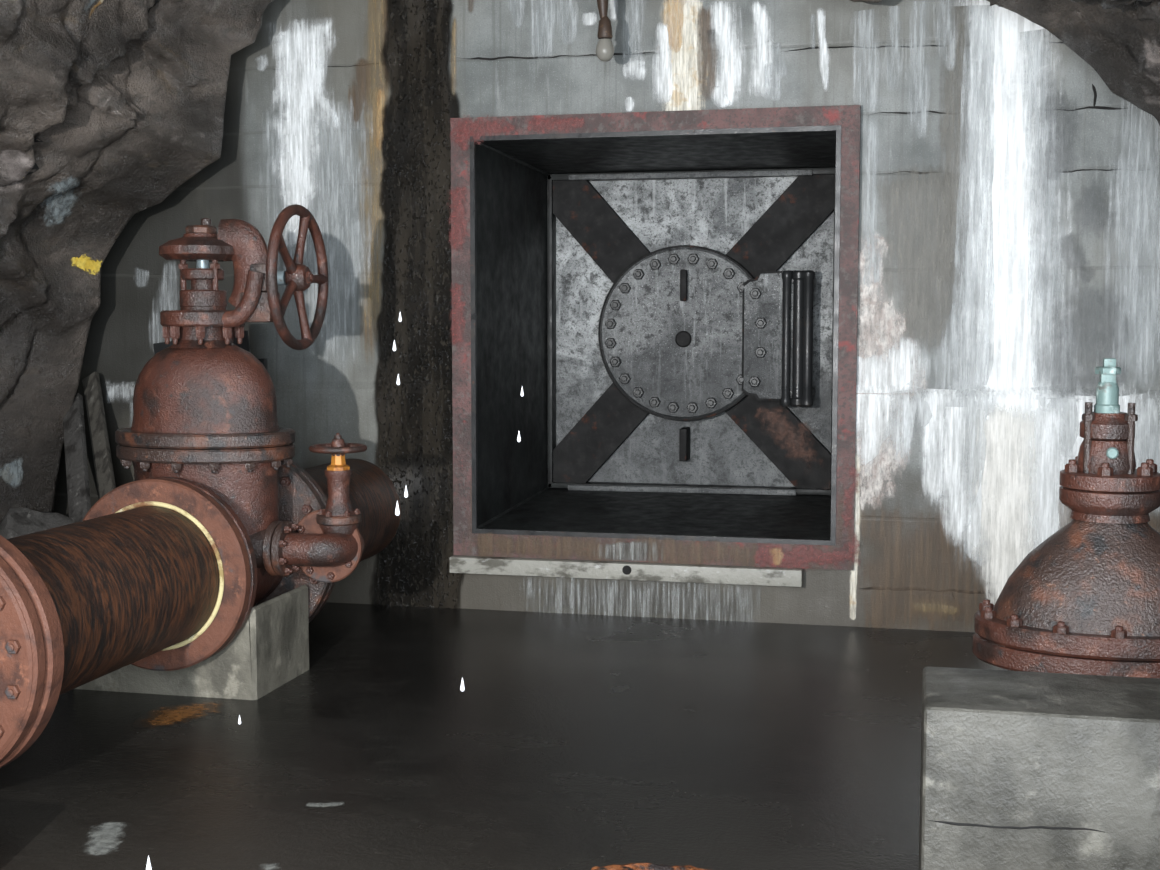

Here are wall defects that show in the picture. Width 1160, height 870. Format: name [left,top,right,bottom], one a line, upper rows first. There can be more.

damp [532,0,595,52]
damp [610,0,778,111]
corrosion [699,9,715,93]
damp [813,10,828,88]
damp [1145,44,1160,85]
damp [268,23,360,341]
damp [1113,102,1160,372]
damp [153,267,172,343]
damp [372,0,464,609]
damp [850,0,1096,620]
damp [108,384,134,407]
damp [1119,388,1160,473]